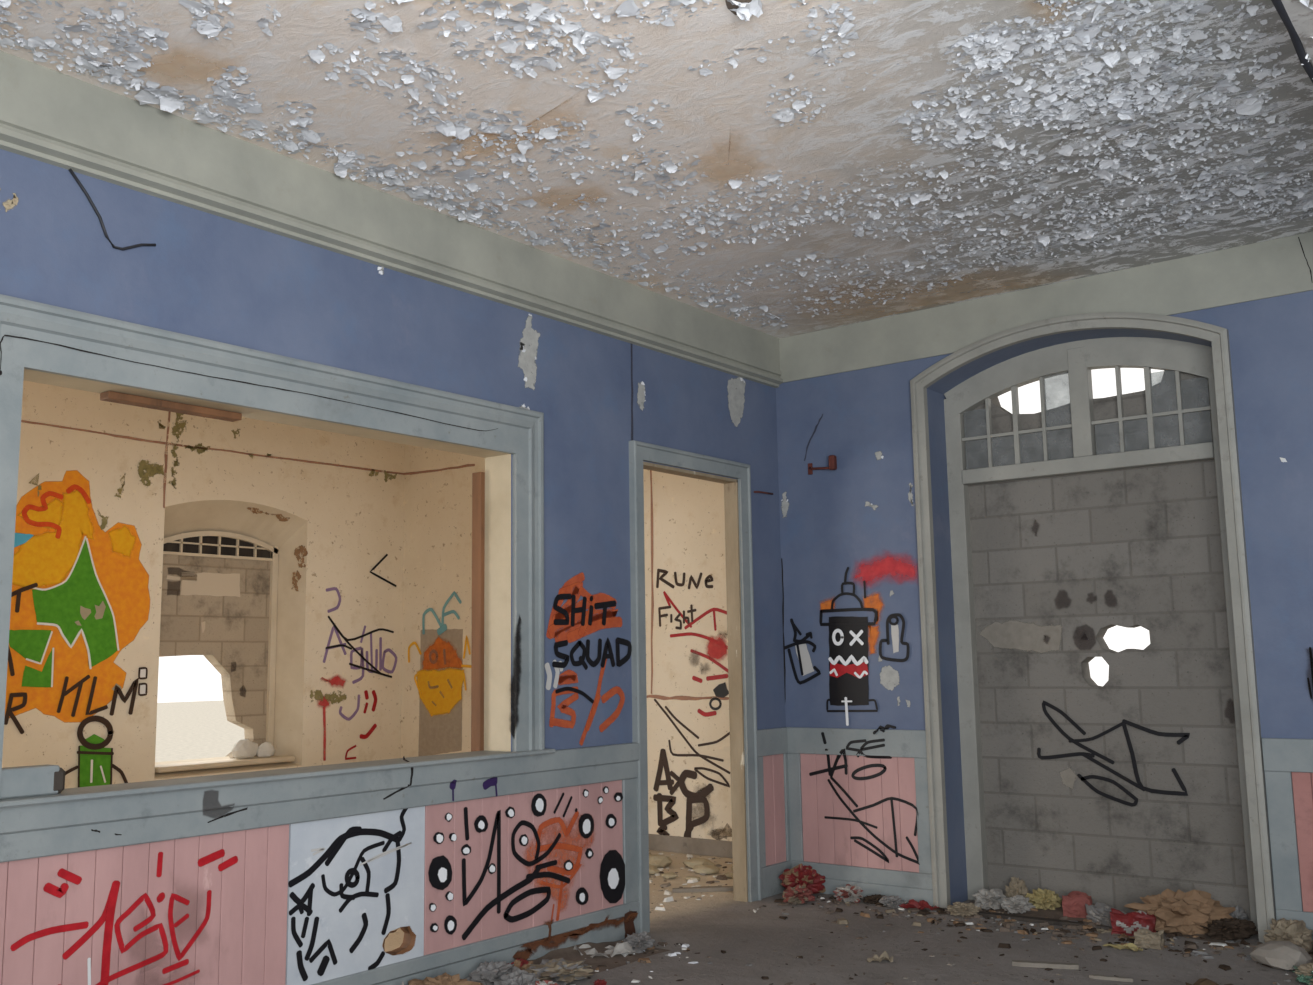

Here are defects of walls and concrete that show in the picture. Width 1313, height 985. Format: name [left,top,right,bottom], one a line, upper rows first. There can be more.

peeling [0,0,1313,328]
peeling [518,314,540,390]
peeling [637,381,646,411]
peeling [727,377,746,427]
spalling [383,926,416,955]